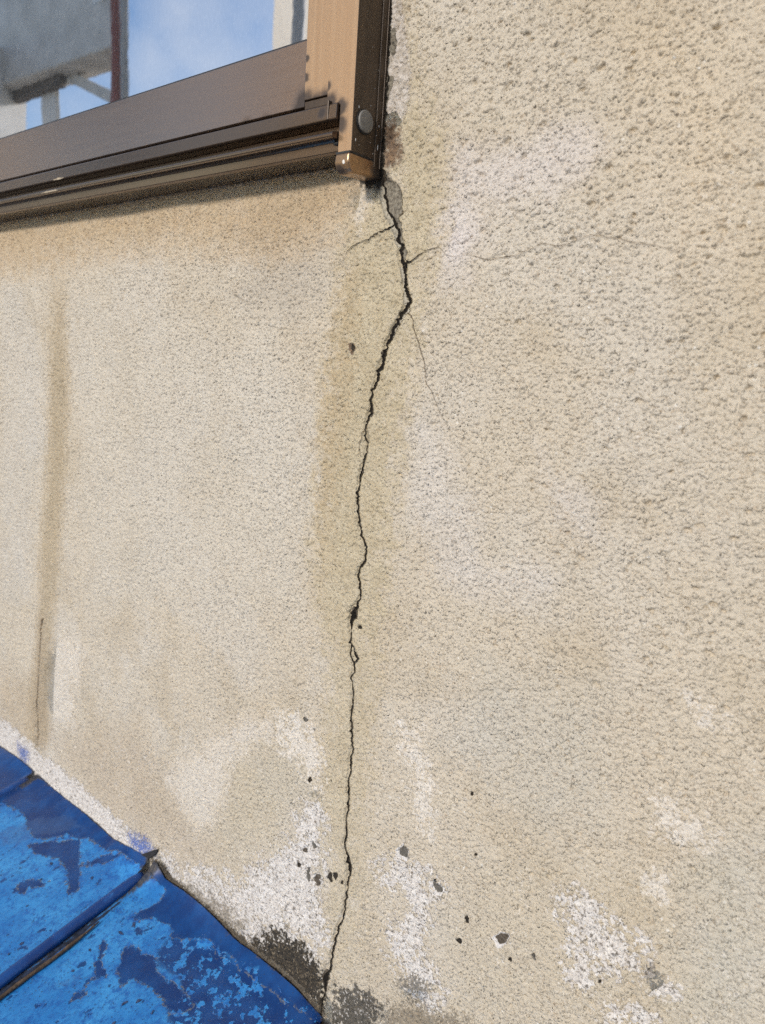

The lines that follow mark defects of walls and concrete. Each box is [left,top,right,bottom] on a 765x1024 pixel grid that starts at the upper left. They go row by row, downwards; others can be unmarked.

leakage [176,877,473,1024]
crack [320,175,724,1015]